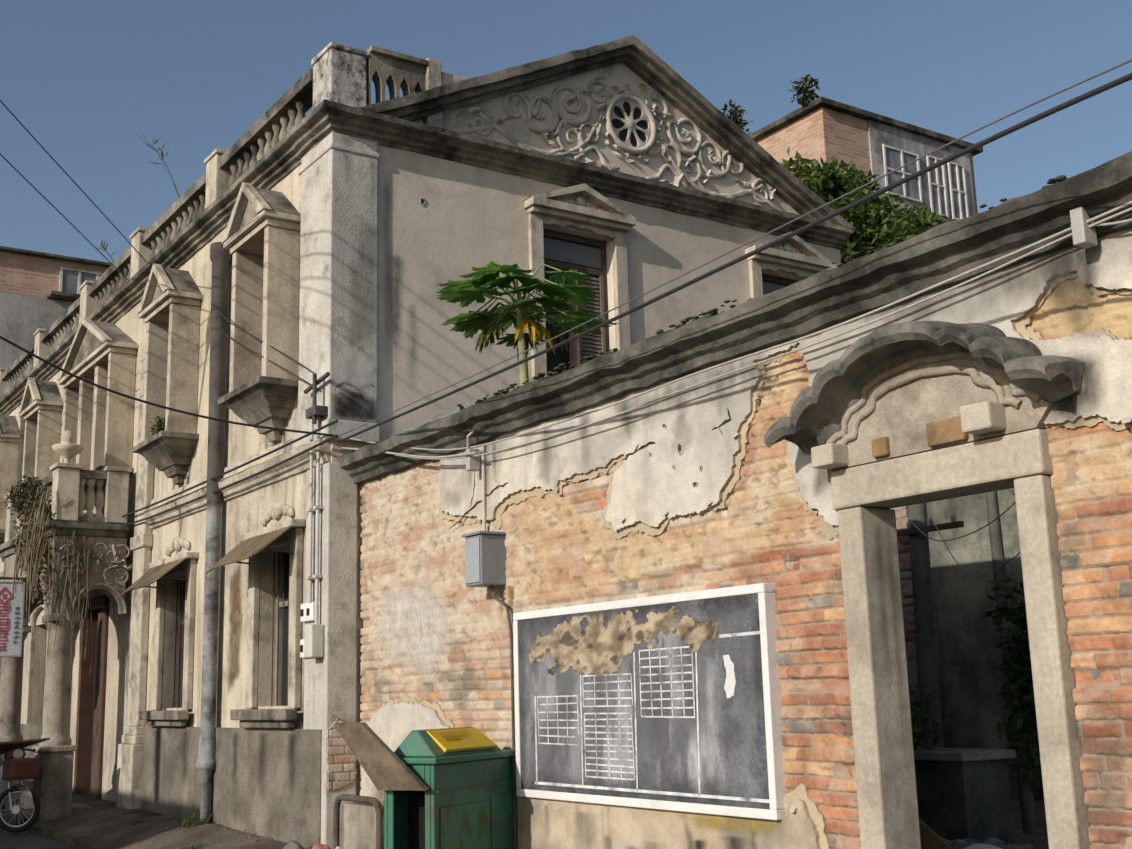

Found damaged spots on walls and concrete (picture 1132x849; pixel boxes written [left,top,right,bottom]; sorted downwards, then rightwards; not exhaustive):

damp [334,352,375,419]
flaking render [360,351,861,849]
spalling [1027,277,1132,340]
flaking render [1045,416,1132,849]